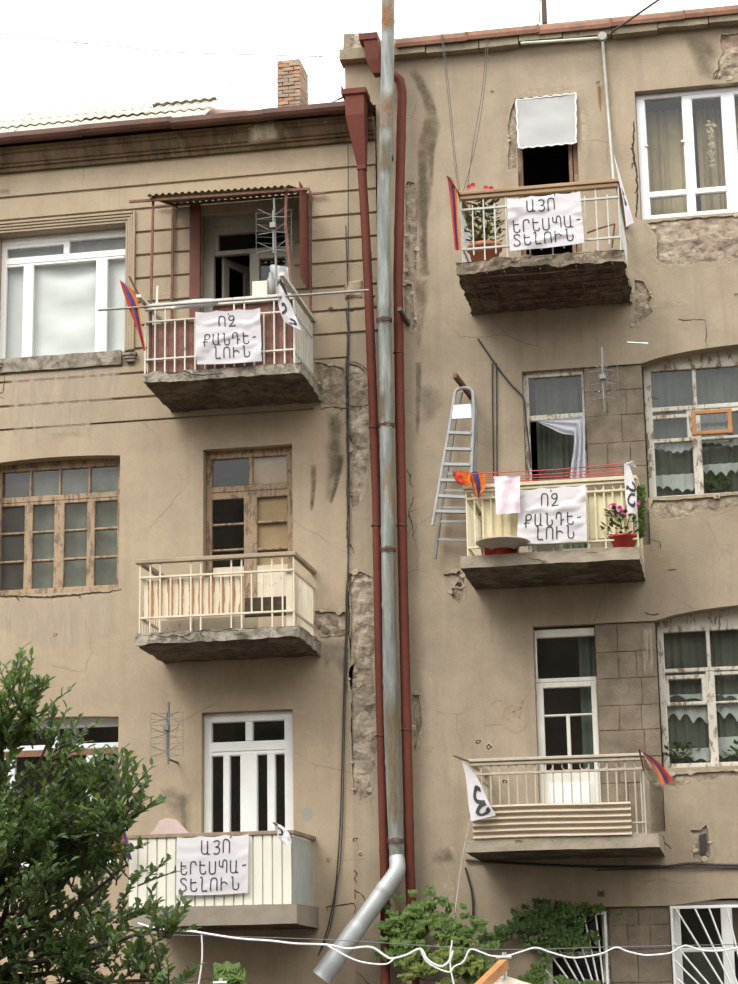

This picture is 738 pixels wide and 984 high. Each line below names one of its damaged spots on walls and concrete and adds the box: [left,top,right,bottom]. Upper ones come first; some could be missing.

flaking render [713,32,738,81]
leakage [415,75,436,258]
flaking render [630,279,653,328]
flaking render [313,569,373,637]